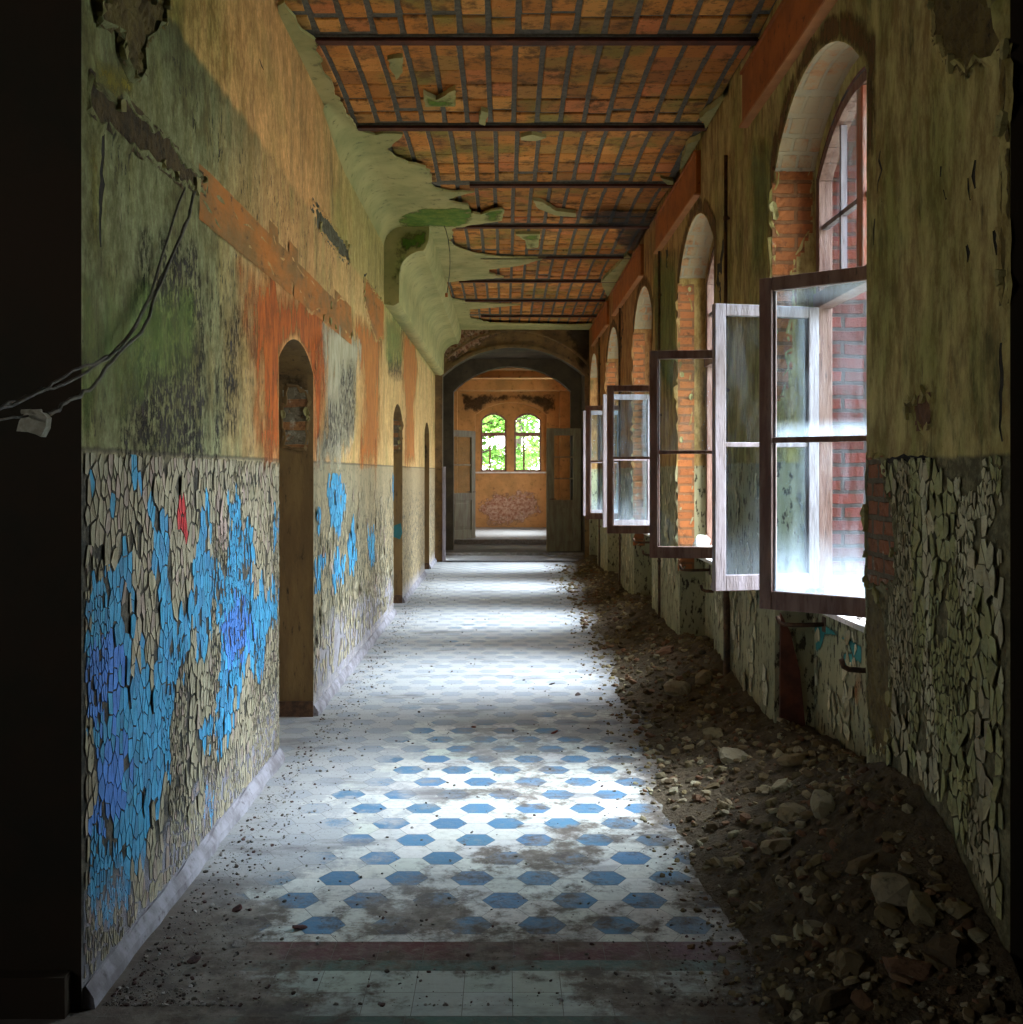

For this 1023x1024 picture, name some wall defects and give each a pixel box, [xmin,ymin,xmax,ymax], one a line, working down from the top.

spalling [86,0,353,345]
spalling [278,0,777,361]
spalling [926,0,1014,314]
leakage [121,228,243,470]
spalling [279,383,312,452]
leakage [317,322,361,470]
peeling [84,453,280,978]
peeling [314,473,394,693]
peeling [715,590,768,706]
peeling [812,449,1005,920]